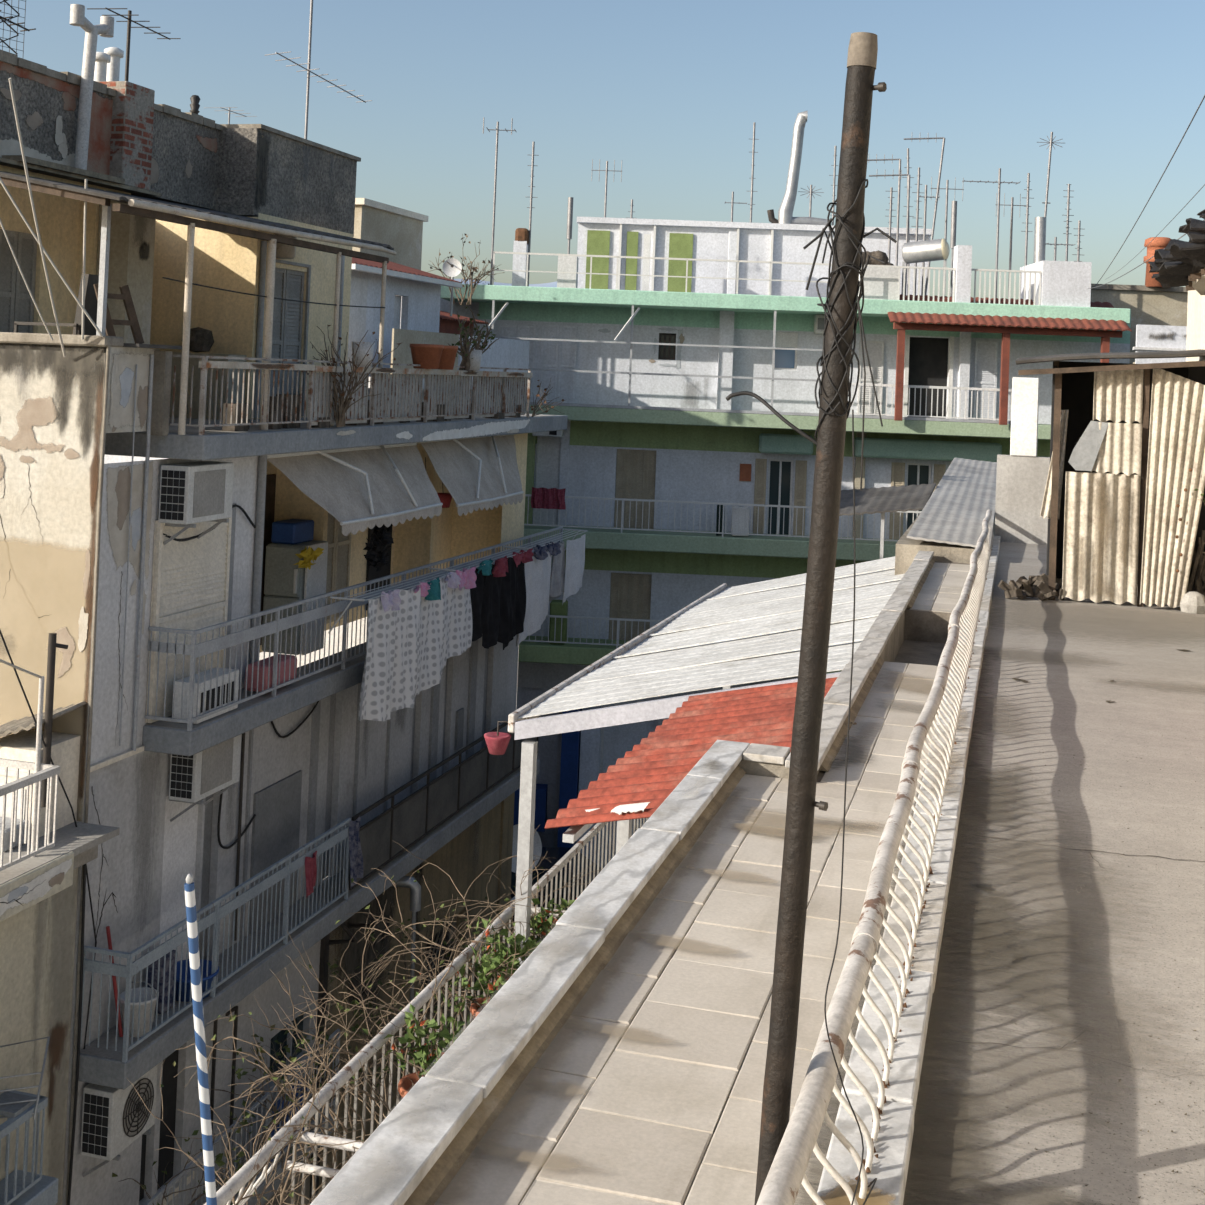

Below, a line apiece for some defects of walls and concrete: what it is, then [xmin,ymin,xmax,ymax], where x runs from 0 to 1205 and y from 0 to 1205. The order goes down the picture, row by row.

flaking render [0,61,113,175]
peeling [0,396,79,498]
damp [0,343,105,454]
rust [898,866,933,1011]
damp [800,697,1074,1205]
rust [855,1029,901,1185]